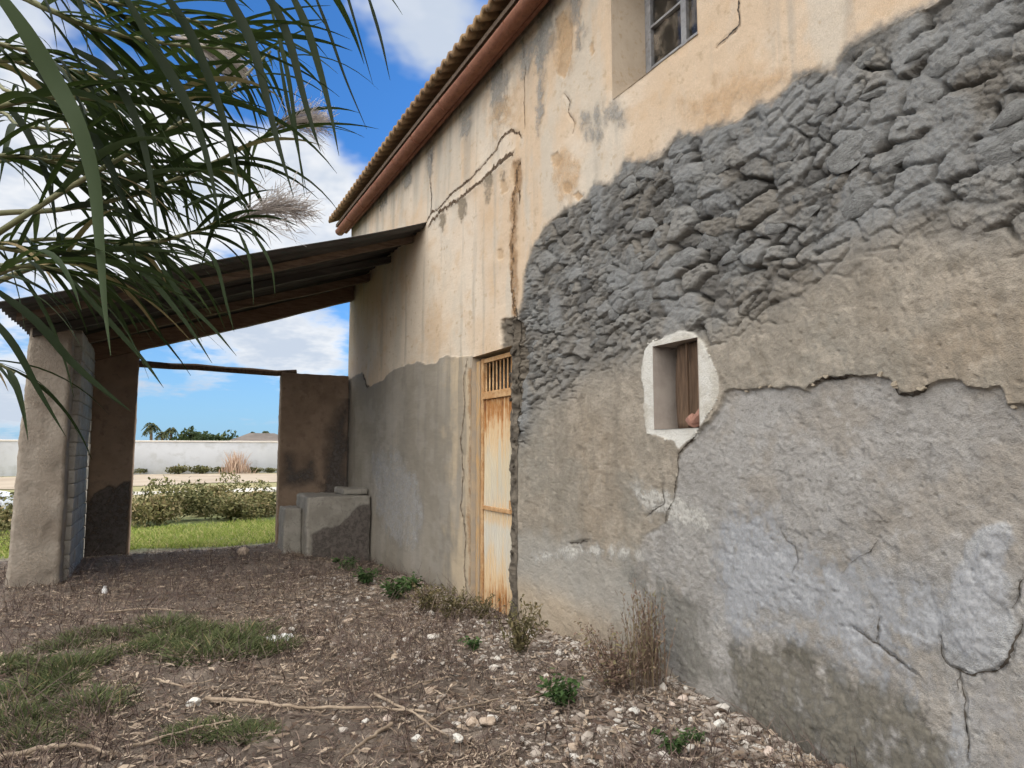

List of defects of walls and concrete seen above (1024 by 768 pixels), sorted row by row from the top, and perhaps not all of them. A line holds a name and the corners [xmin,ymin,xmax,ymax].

crack [718,0,740,45]
crack [427,45,526,322]
crack [646,432,698,522]
spalling [633,372,1024,768]
crack [854,618,916,674]
crack [941,580,1023,763]